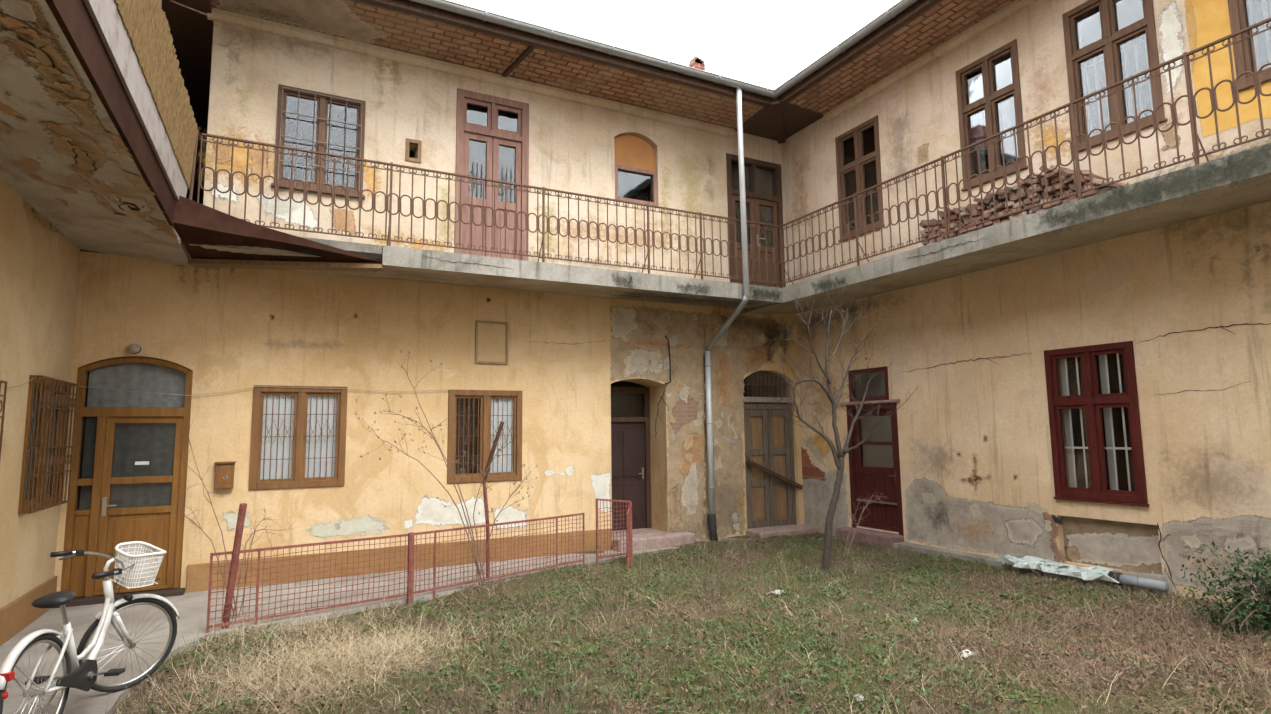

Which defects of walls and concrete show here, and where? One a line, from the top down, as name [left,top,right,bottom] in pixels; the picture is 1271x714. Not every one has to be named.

peeling [1158,1,1187,94]
peeling [0,0,179,240]
peeling [1161,122,1181,151]
leakage [1041,136,1271,232]
crack [901,353,1030,373]
crack [1137,323,1271,344]
flaking render [609,305,789,541]
peeling [221,508,252,532]
peeling [303,495,529,540]
peeling [591,472,611,514]
flaking render [801,435,849,536]
flaking render [905,477,1271,601]